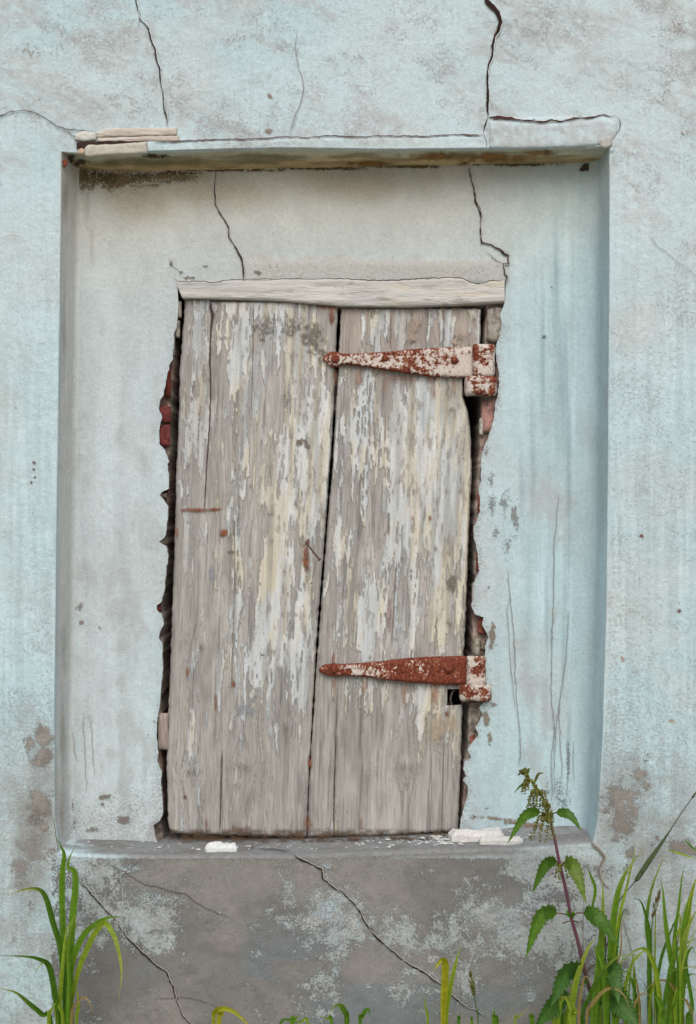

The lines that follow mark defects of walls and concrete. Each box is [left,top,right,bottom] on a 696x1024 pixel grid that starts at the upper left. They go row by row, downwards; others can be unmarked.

crack [0,110,94,141]
water stain [85,151,563,189]
crack [169,166,510,285]
crack [135,0,621,146]
peeling [159,299,503,808]
crack [79,860,226,1024]
crack [249,846,486,1018]